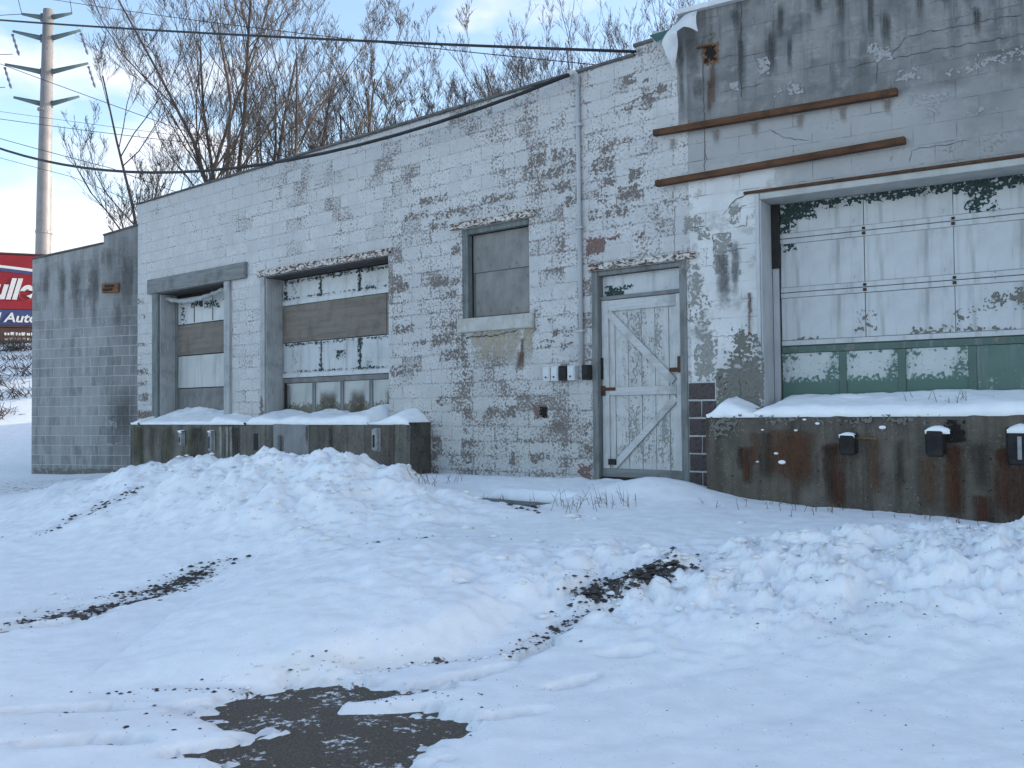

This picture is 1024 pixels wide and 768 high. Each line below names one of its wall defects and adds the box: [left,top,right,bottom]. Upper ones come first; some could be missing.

leakage [868,0,890,35]
leakage [679,41,701,100]
crack [850,14,1022,81]
peeling [588,137,641,222]
peeling [779,174,1024,253]
leakage [718,247,738,293]
peeling [677,203,799,440]
peeling [907,287,1024,335]
peeling [285,320,474,387]
rust [738,431,808,482]
rust [822,444,844,503]
rust [973,495,991,522]